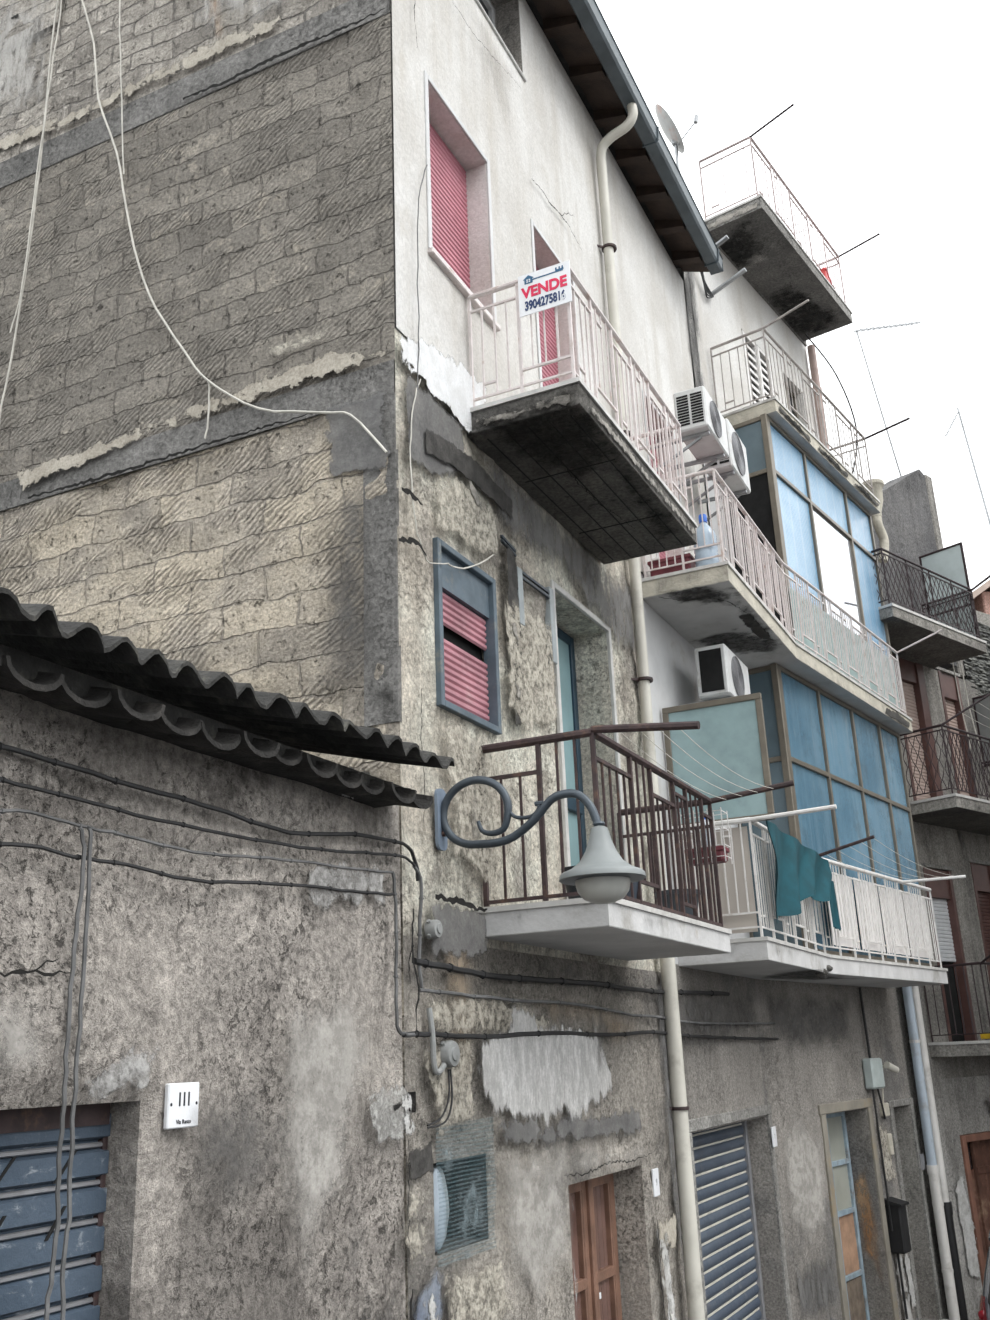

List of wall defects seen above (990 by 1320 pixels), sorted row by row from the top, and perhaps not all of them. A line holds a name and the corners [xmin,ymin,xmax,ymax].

leakage [720,222,763,267]
leakage [771,291,835,333]
flaking render [416,1261,514,1320]
peeling [656,1213,677,1320]